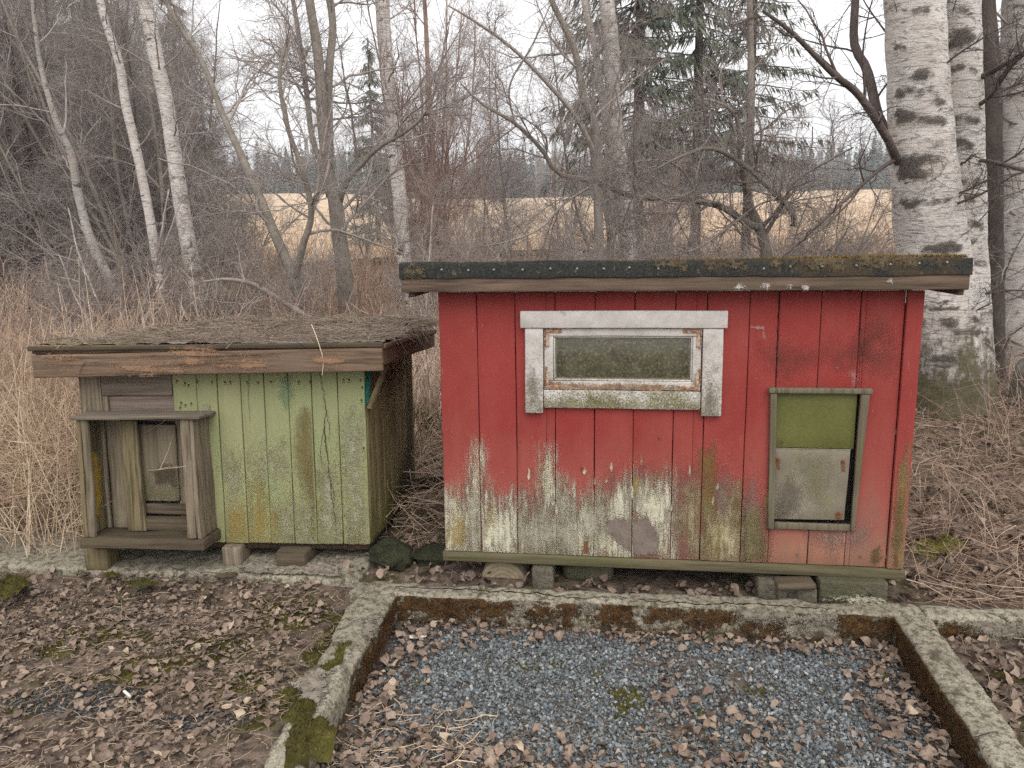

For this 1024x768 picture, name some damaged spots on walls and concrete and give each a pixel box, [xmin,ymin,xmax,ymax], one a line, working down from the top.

crack [319,372,337,541]
peeling [444,439,761,562]